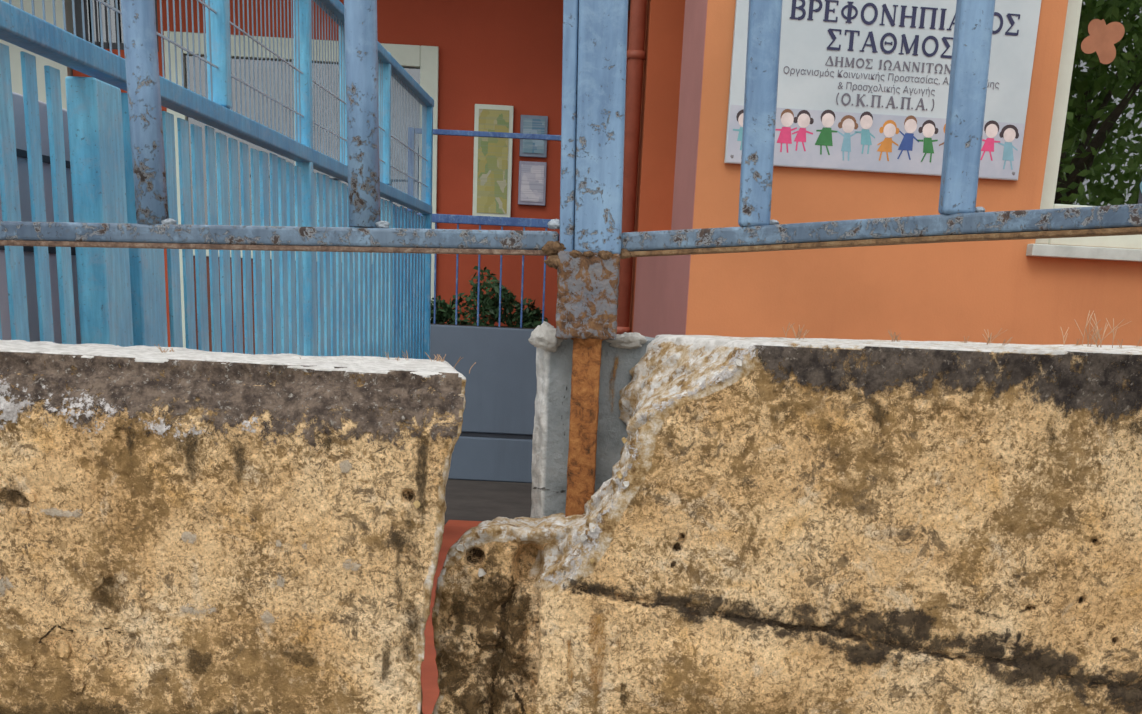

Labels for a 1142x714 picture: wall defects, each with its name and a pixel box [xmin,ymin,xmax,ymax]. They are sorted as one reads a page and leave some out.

damp [754,345,1142,435]
spalling [544,345,764,584]
damp [0,352,464,662]
crack [572,589,725,618]
damp [185,649,212,674]
damp [282,643,314,667]
damp [382,646,390,682]
crack [755,603,1142,690]
damp [0,695,128,714]